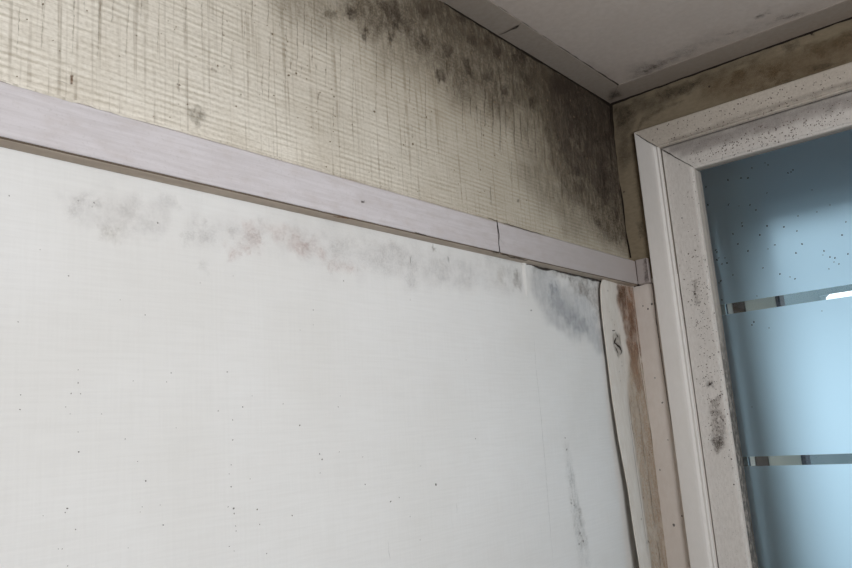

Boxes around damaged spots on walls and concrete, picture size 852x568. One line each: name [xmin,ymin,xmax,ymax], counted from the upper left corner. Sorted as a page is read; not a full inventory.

water stain [348,0,627,242]
water stain [526,264,601,282]
water stain [629,358,666,568]